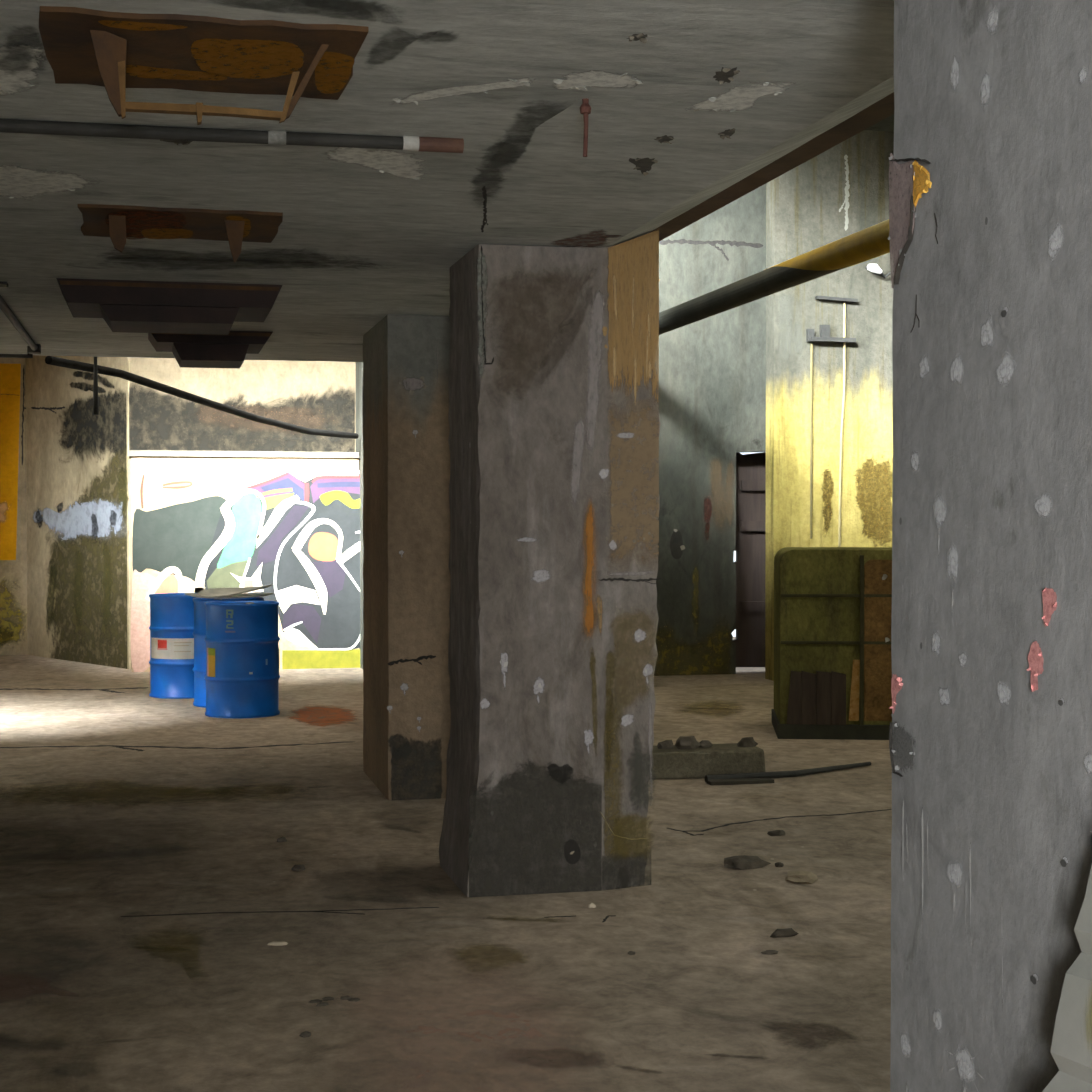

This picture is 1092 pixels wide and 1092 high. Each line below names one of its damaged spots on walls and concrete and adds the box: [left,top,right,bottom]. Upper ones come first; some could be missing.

peeling [393,78,532,105]
peeling [553,70,643,91]
peeling [693,67,791,112]
crack [473,186,488,232]
spalling [887,153,932,289]
damp [822,469,834,533]
damp [855,458,893,547]
damp [33,440,128,669]
corrosion [584,504,602,634]
crack [598,572,661,584]
crack [388,655,436,666]
damp [469,760,651,897]